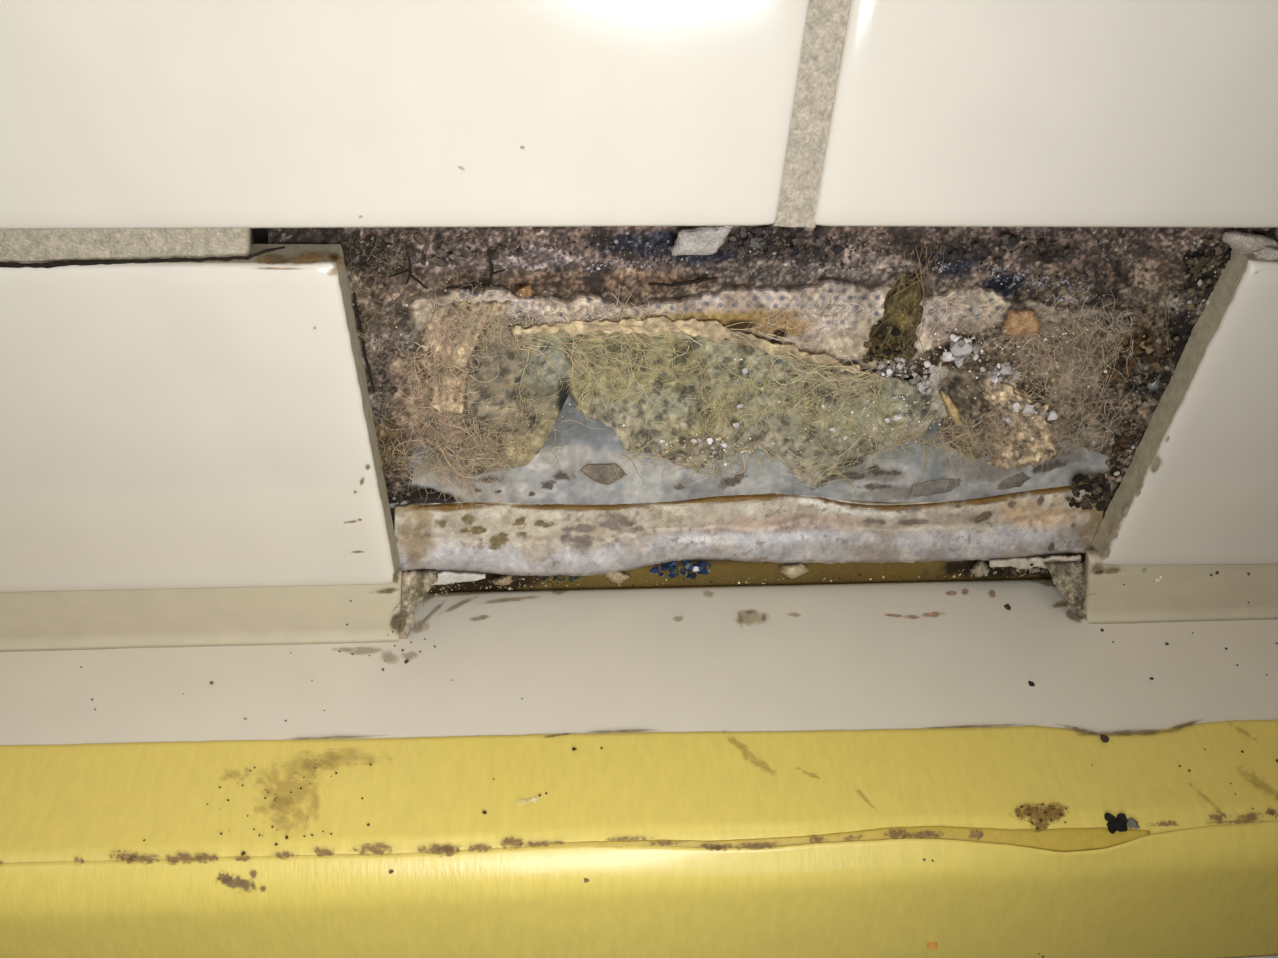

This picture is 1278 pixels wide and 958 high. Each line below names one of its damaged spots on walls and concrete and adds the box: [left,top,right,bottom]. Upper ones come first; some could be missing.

water stain [571,254,672,273]
water stain [862,262,1105,364]
peeling [928,361,950,391]
water stain [529,471,569,496]
water stain [722,474,744,486]
water stain [841,458,900,490]
water stain [1033,460,1067,473]
water stain [461,514,638,550]
water stain [902,506,927,525]
water stain [975,512,991,523]
spalling [1101,485,1143,559]